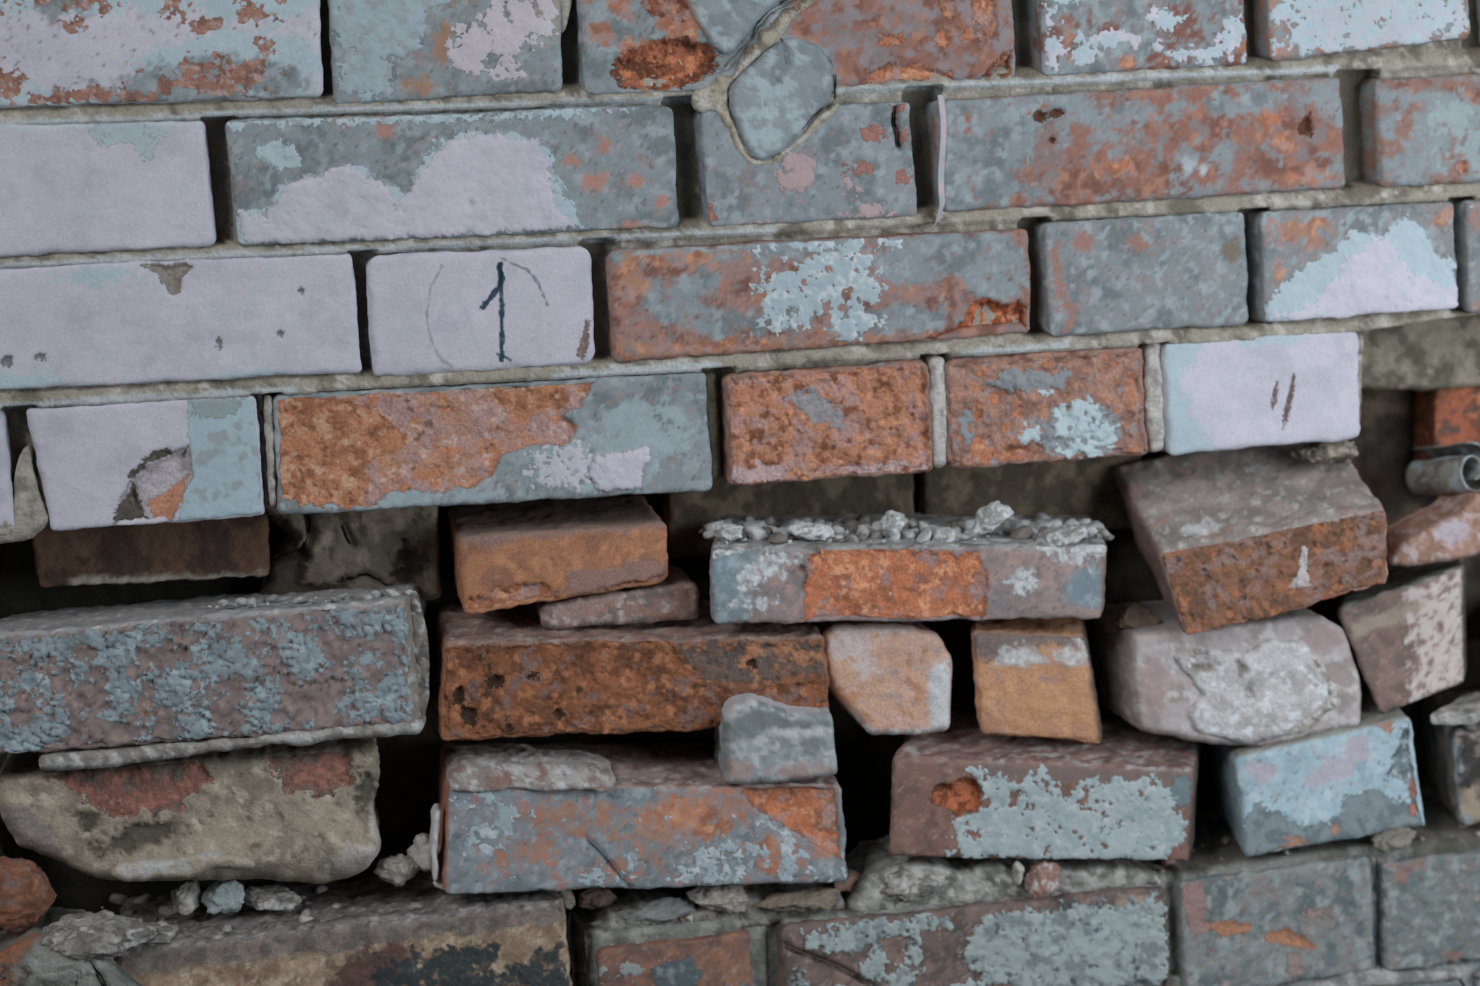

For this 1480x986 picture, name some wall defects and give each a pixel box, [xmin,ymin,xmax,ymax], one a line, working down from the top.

peeling [226,0,725,245]
peeling [718,238,903,342]
peeling [1264,213,1477,322]
spalling [112,382,661,524]
spalling [729,364,931,484]
spalling [947,350,1146,466]
spalling [800,548,990,621]
spalling [1162,510,1387,635]
peeling [0,604,414,753]
spalling [442,638,827,739]
peeling [930,763,1194,860]
peeling [800,881,1330,986]